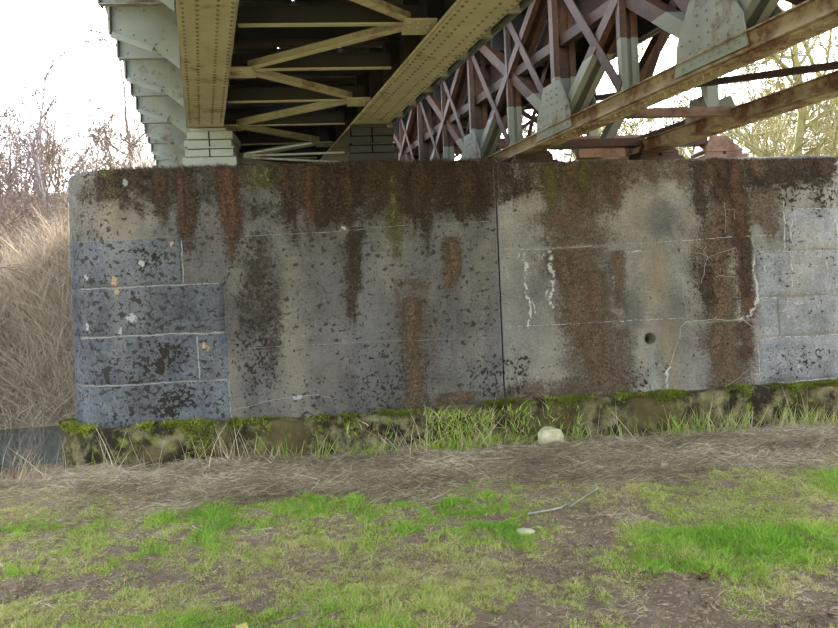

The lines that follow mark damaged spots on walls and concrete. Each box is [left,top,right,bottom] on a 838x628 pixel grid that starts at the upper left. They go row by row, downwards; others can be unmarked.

leakage [78,156,838,410]
crack [670,240,760,364]
corrosion [732,181,757,319]